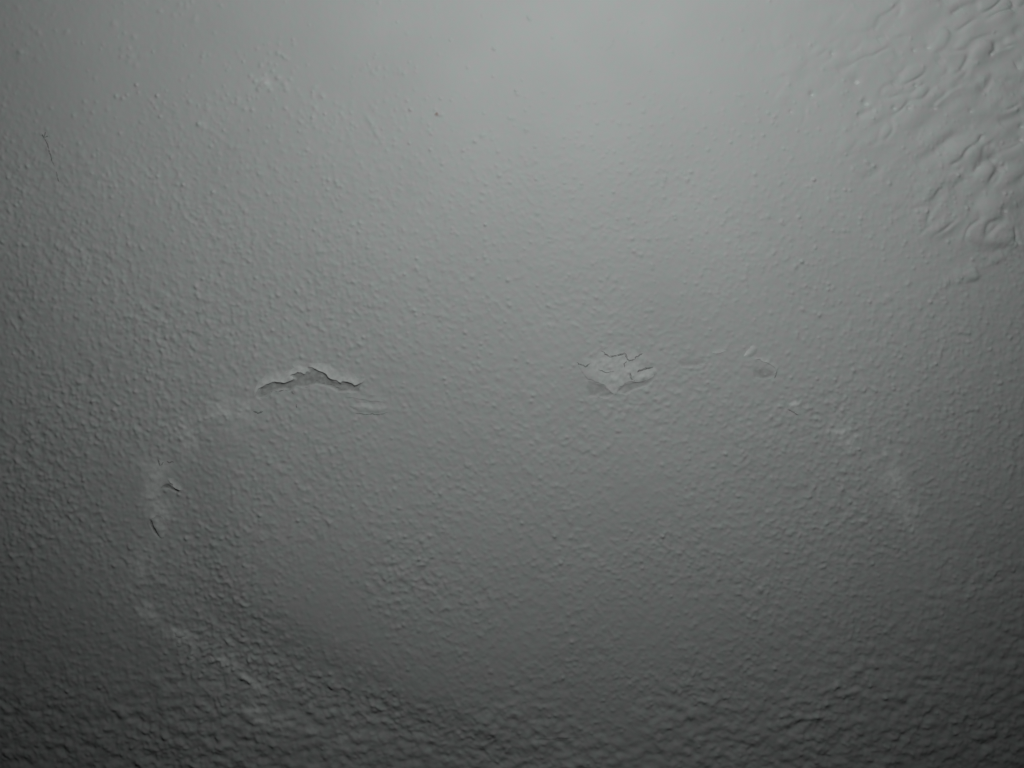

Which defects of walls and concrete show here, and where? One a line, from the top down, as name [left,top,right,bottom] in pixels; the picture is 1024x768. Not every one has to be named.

peeling [253,361,388,415]
peeling [577,345,658,398]